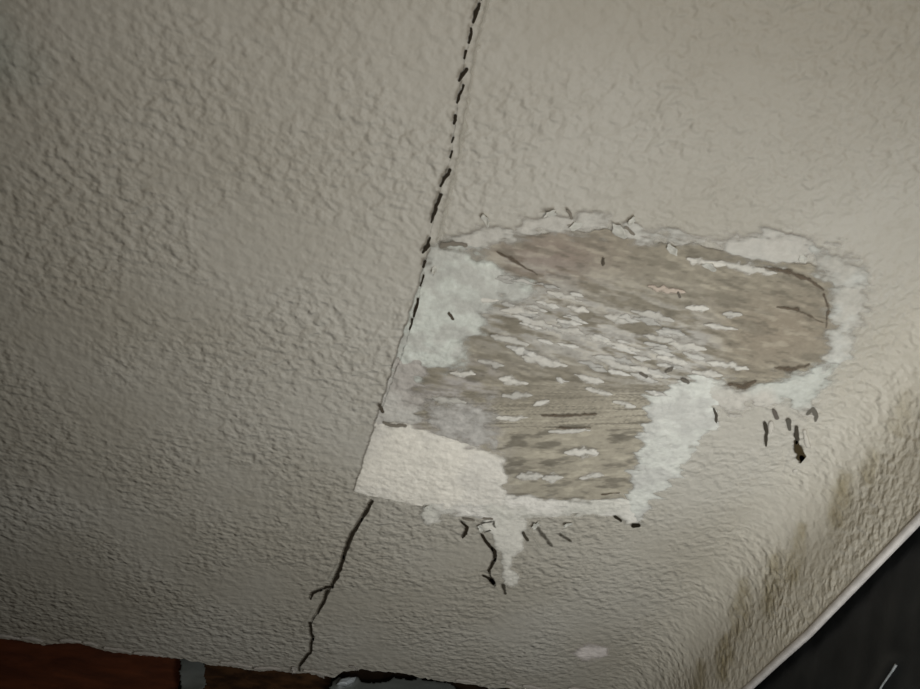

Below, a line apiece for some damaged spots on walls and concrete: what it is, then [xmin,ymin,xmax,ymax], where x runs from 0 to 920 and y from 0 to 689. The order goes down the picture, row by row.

crack [409,0,489,330]
flaking render [354,209,870,586]
crack [299,500,374,672]
crack [461,521,507,595]
crack [522,523,572,547]
spalling [59,639,163,657]
spalling [220,661,330,679]